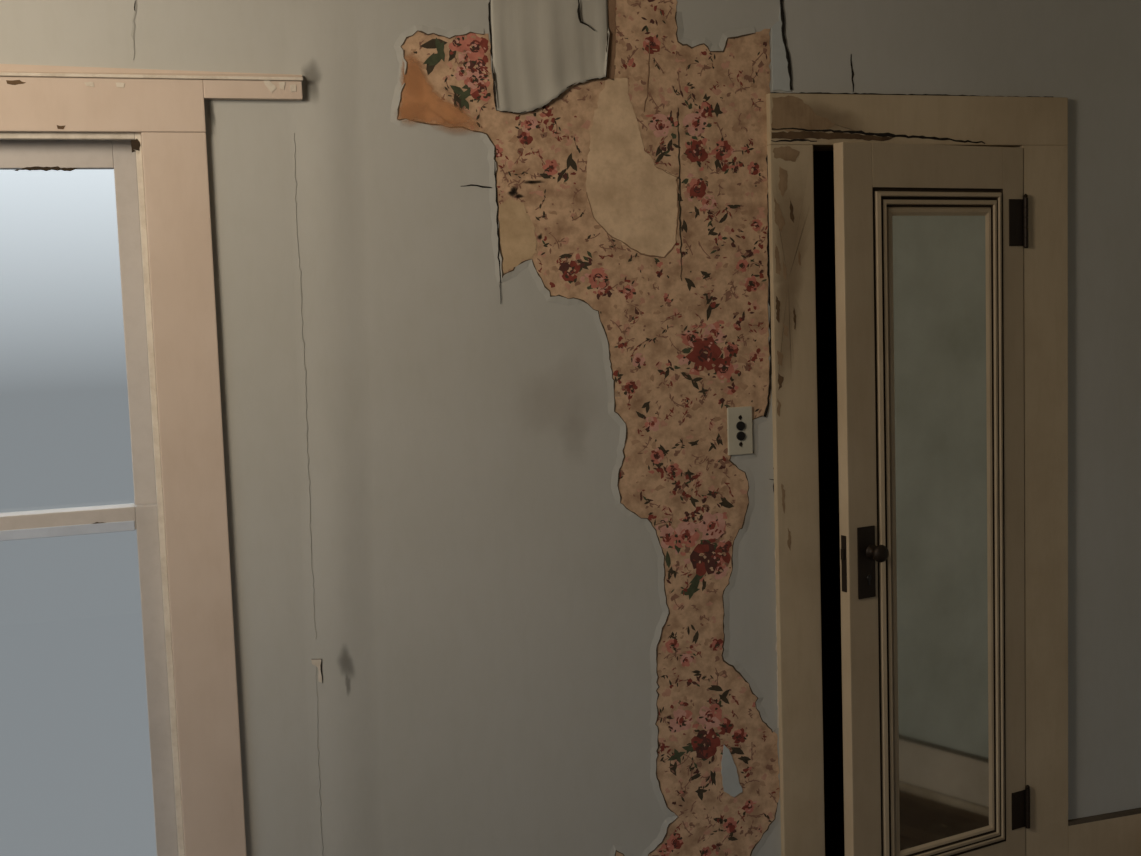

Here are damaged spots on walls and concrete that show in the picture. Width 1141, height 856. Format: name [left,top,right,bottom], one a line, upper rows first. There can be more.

crack [770,0,1048,97]
peeling [721,745,742,797]